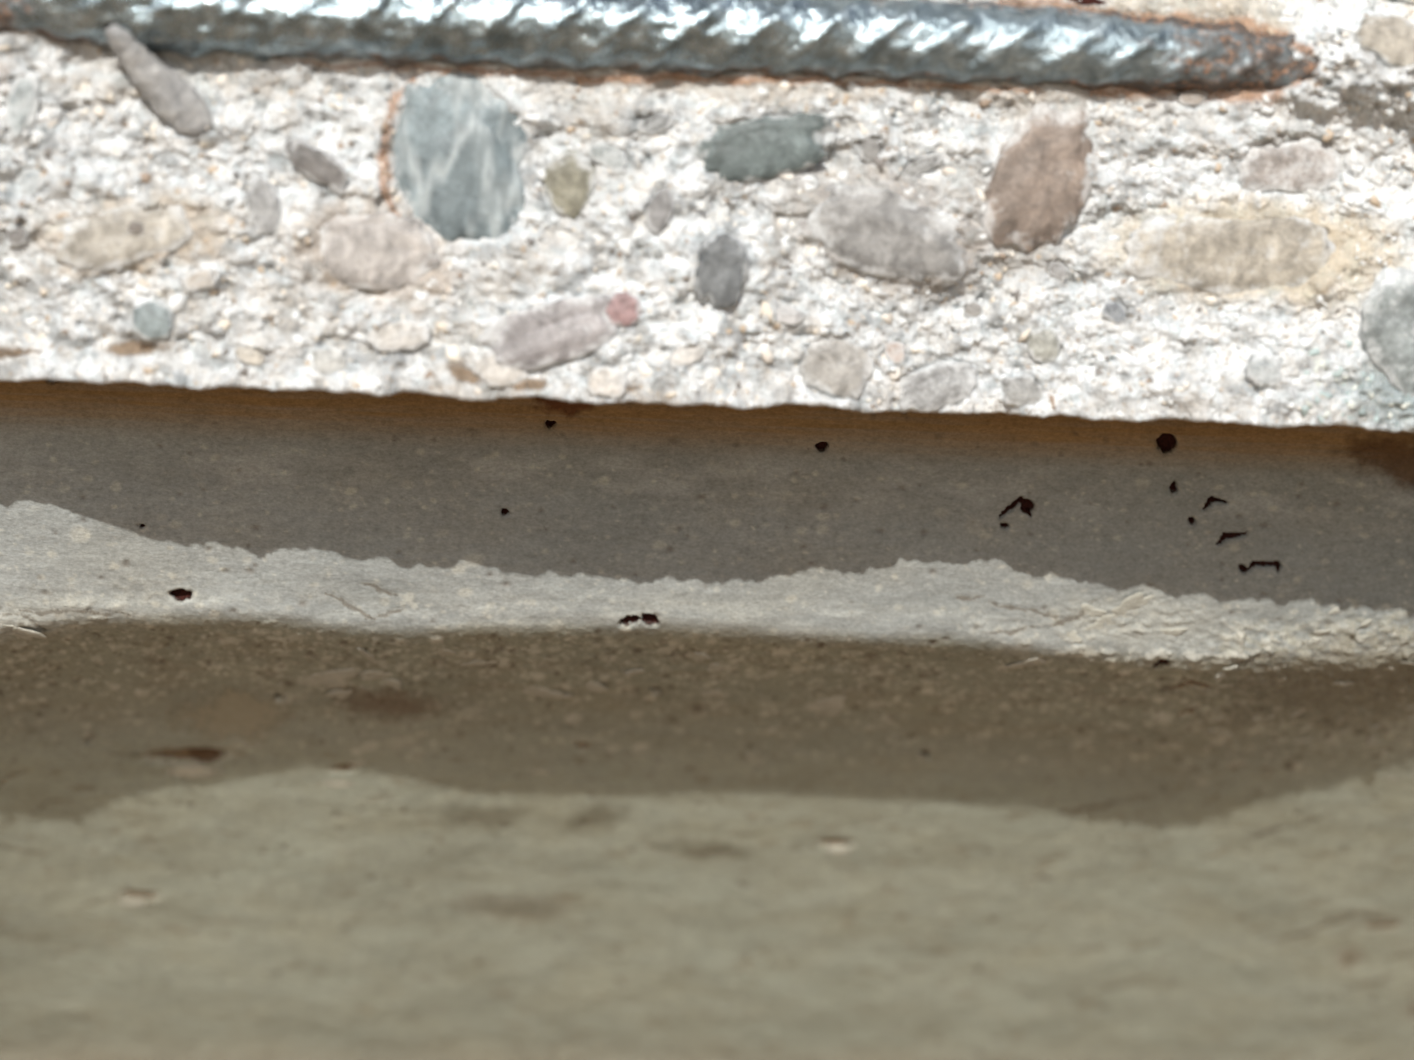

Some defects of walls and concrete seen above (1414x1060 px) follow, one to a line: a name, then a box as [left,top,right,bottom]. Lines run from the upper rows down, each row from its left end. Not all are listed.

spalling [0,0,1414,433]